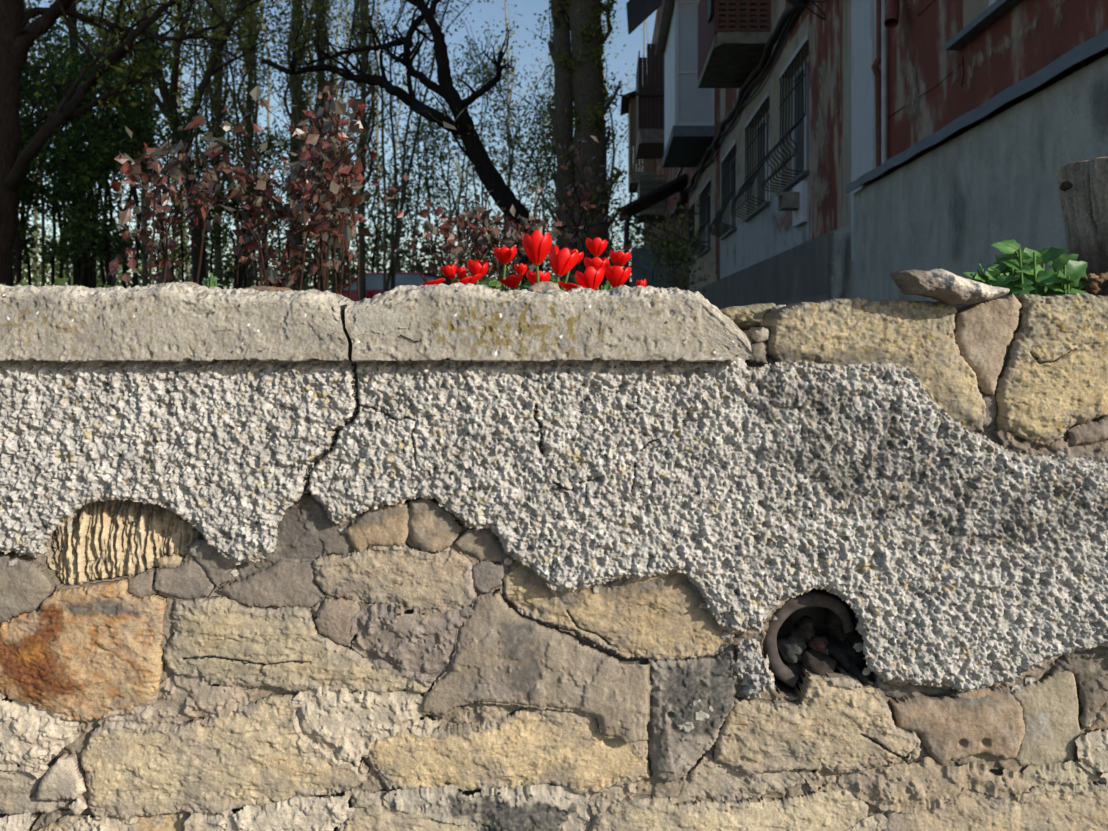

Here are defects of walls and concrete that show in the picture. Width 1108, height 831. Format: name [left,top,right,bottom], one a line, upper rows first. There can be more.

crack [303,304,417,496]
crack [534,404,543,455]
spalling [748,347,1108,463]
crack [552,479,595,497]
spalling [0,489,1108,711]
corrosion [0,604,80,705]
damp [448,792,576,831]